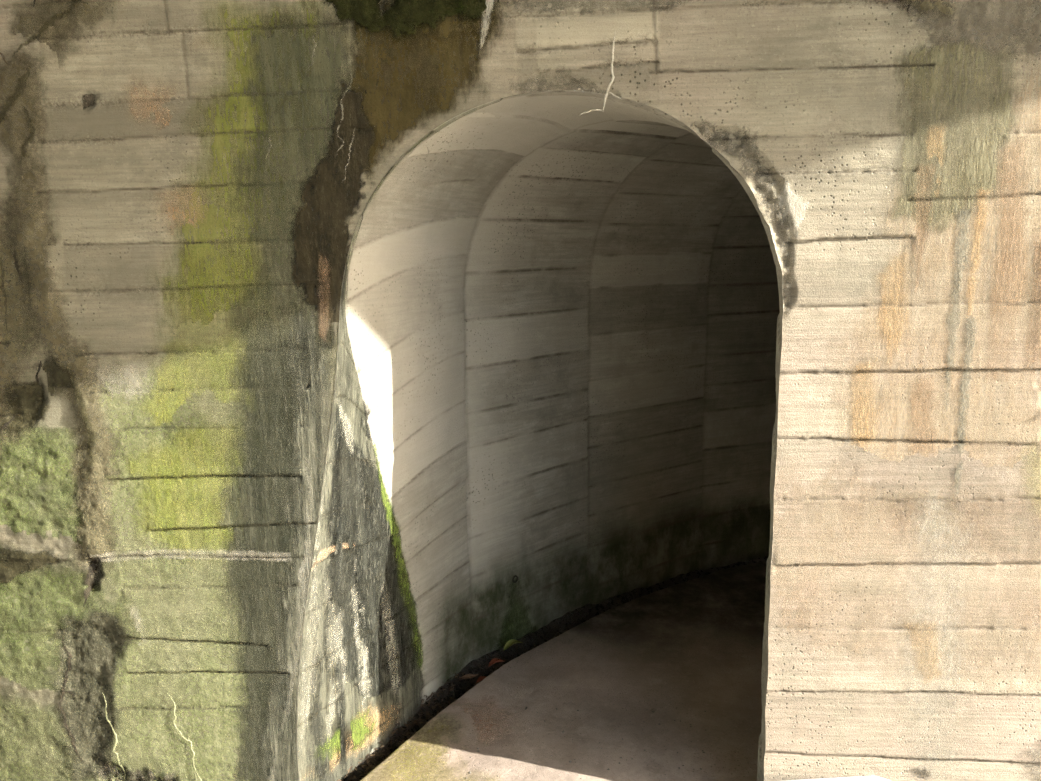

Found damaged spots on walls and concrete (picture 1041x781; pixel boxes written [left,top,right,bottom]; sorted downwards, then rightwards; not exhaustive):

crack [580,35,621,115]
damp [881,0,1041,55]
damp [0,0,118,561]
damp [210,0,498,781]
corrosion [850,166,1041,490]
damp [0,548,65,583]